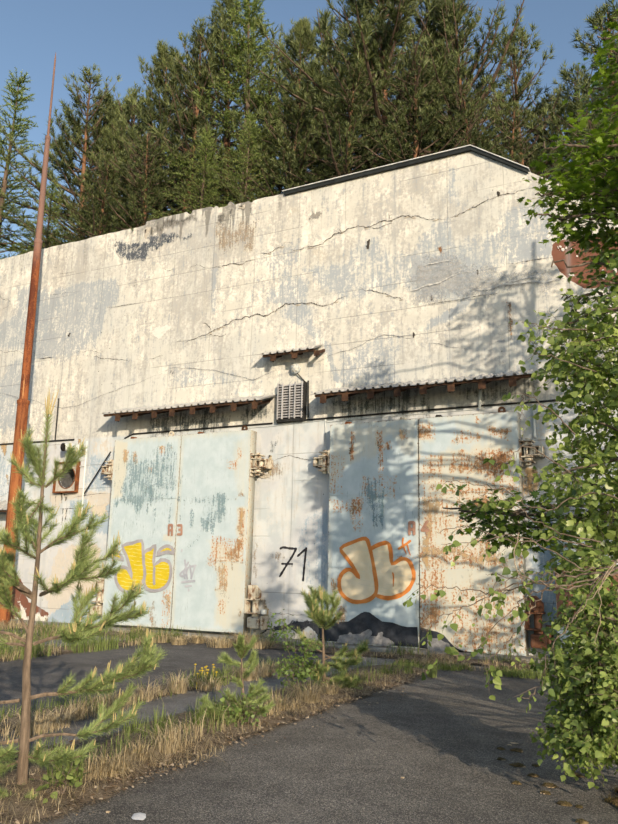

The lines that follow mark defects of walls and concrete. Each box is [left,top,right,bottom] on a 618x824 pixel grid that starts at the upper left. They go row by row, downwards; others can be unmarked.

peeling [114,227,192,261]
leakage [216,211,254,251]
crack [163,188,529,271]
crack [189,296,345,341]
corrosion [450,454,508,475]
corrosion [215,508,244,590]
corrosion [418,490,505,570]